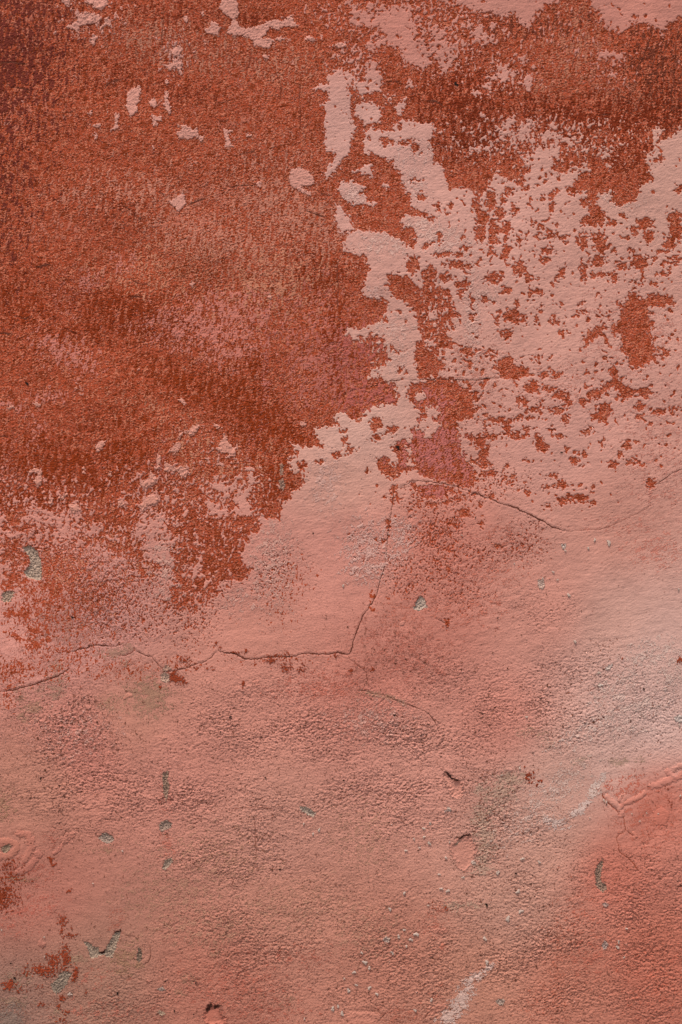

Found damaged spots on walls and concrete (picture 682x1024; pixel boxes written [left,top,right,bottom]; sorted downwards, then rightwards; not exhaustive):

peeling [0,0,682,814]
crack [3,469,681,730]
spalling [361,740,555,912]